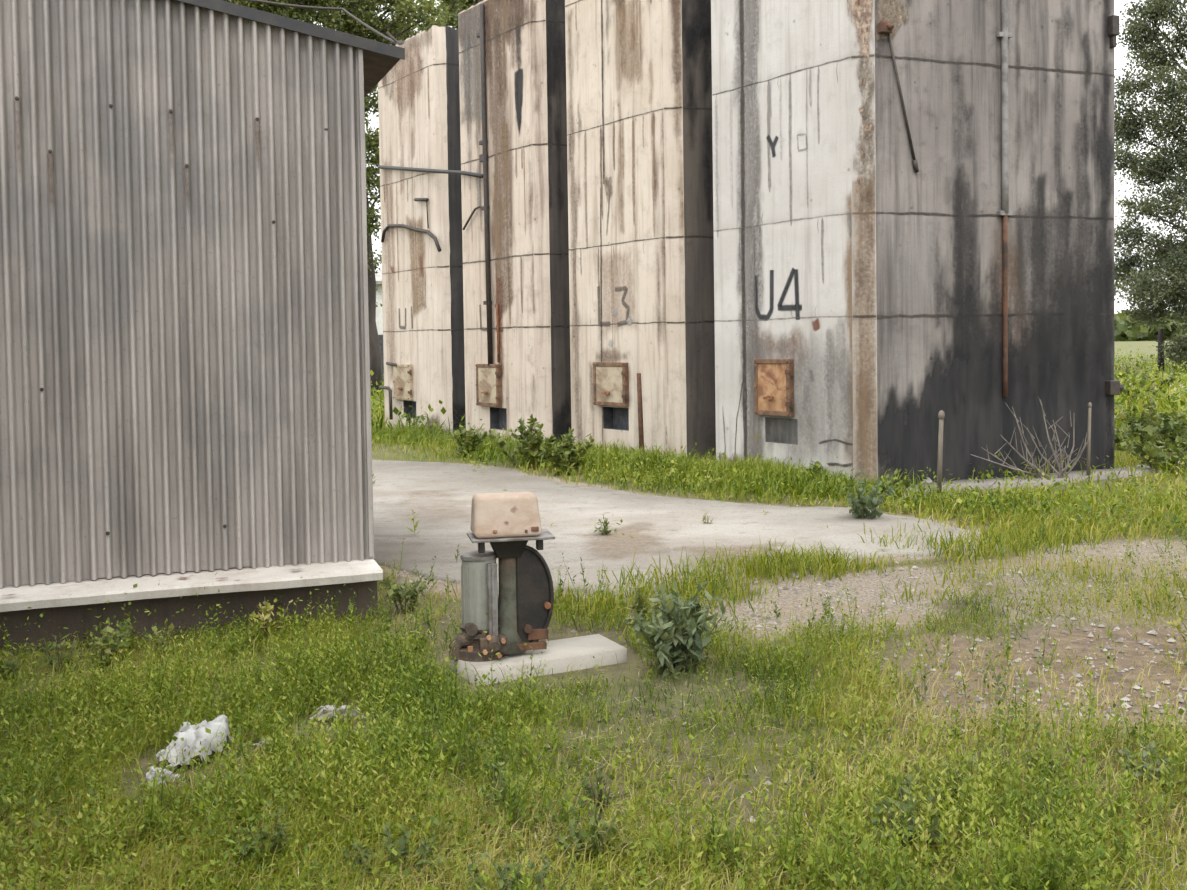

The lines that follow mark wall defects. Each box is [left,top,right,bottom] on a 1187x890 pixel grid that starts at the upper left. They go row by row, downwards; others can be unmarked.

leakage [546,0,576,116]
leakage [673,0,712,121]
leakage [459,0,534,312]
leakage [600,124,615,219]
leakage [632,113,665,221]
leakage [704,111,718,221]
leakage [737,0,780,463]
leakage [878,40,1115,484]
rust [846,179,877,487]